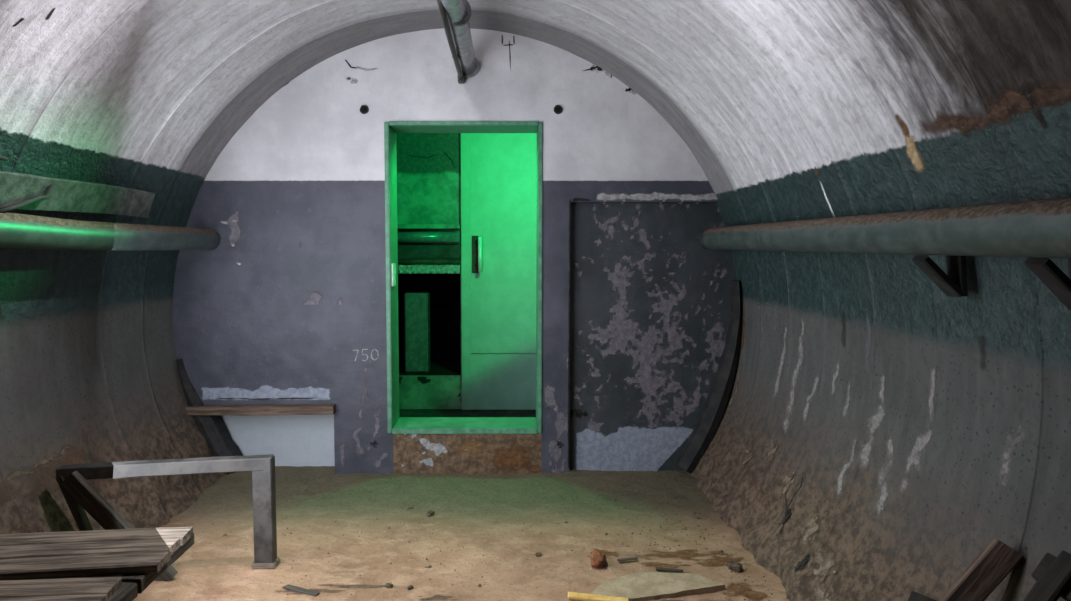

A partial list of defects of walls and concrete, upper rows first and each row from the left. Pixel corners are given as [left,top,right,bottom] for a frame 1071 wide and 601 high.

corrosion [896,115,923,171]
peeling [545,192,727,473]
peeling [201,385,330,401]
water stain [774,322,819,430]
water stain [838,375,885,493]
water stain [877,439,893,511]
water stain [901,431,932,490]